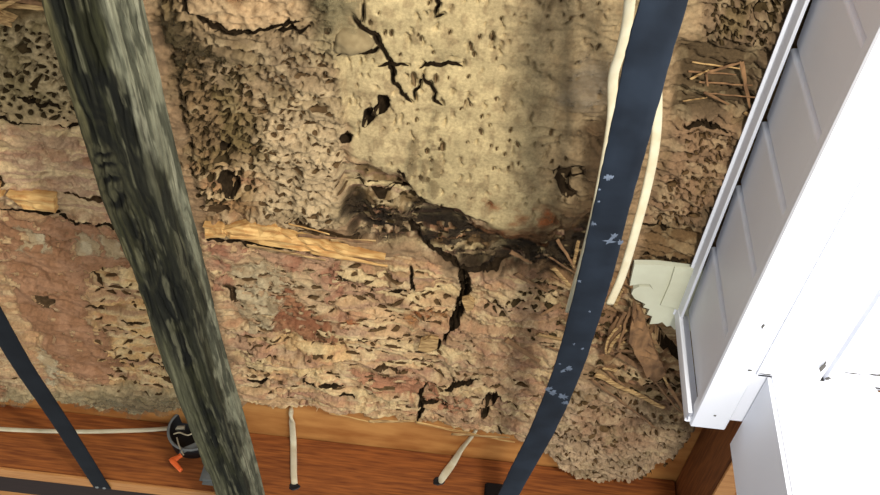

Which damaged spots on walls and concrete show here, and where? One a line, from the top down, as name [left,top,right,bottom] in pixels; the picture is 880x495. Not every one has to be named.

spalling [0,24,77,121]
crack [182,0,311,36]
crack [337,0,463,106]
crack [1,191,115,230]
spalling [170,48,588,316]
crack [371,171,510,353]
crack [372,363,401,374]
crack [417,378,478,422]
spalling [552,339,688,480]